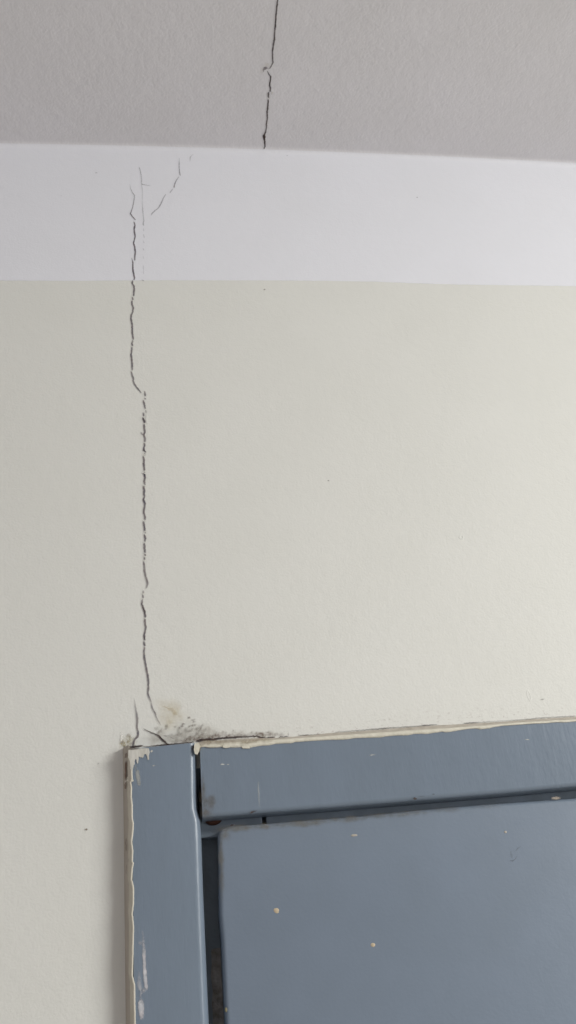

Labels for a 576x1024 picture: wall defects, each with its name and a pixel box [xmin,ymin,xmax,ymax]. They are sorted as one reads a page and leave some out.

crack [263,0,278,149]
crack [130,210,169,746]